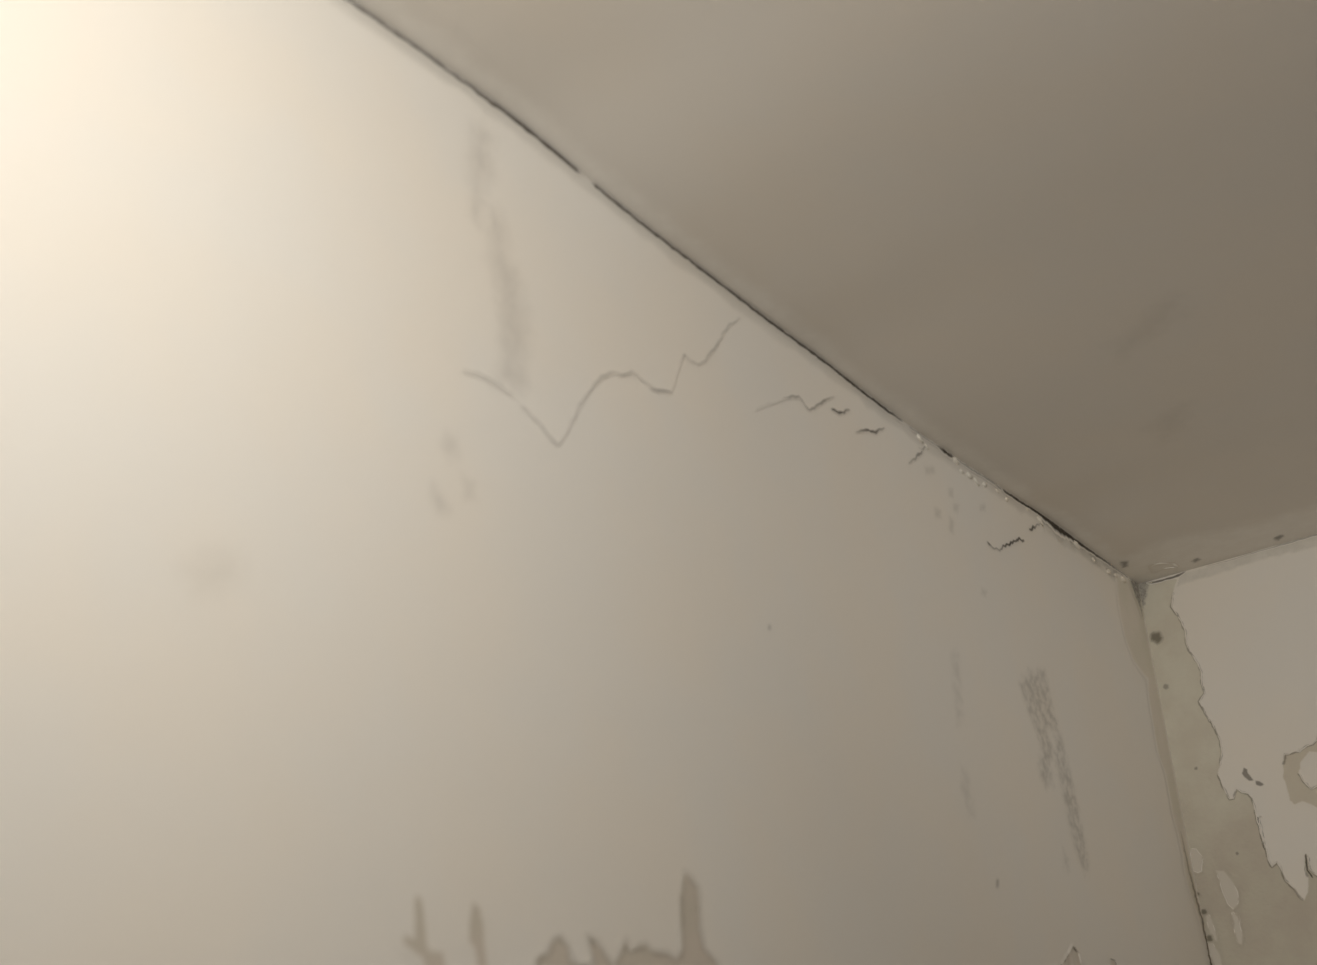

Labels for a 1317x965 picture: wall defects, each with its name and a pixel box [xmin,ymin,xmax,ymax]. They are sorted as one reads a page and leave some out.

crack [341,0,1132,581]
peeling [1074,541,1317,965]
peeling [399,889,450,965]
peeling [465,896,491,965]
peeling [531,867,722,965]